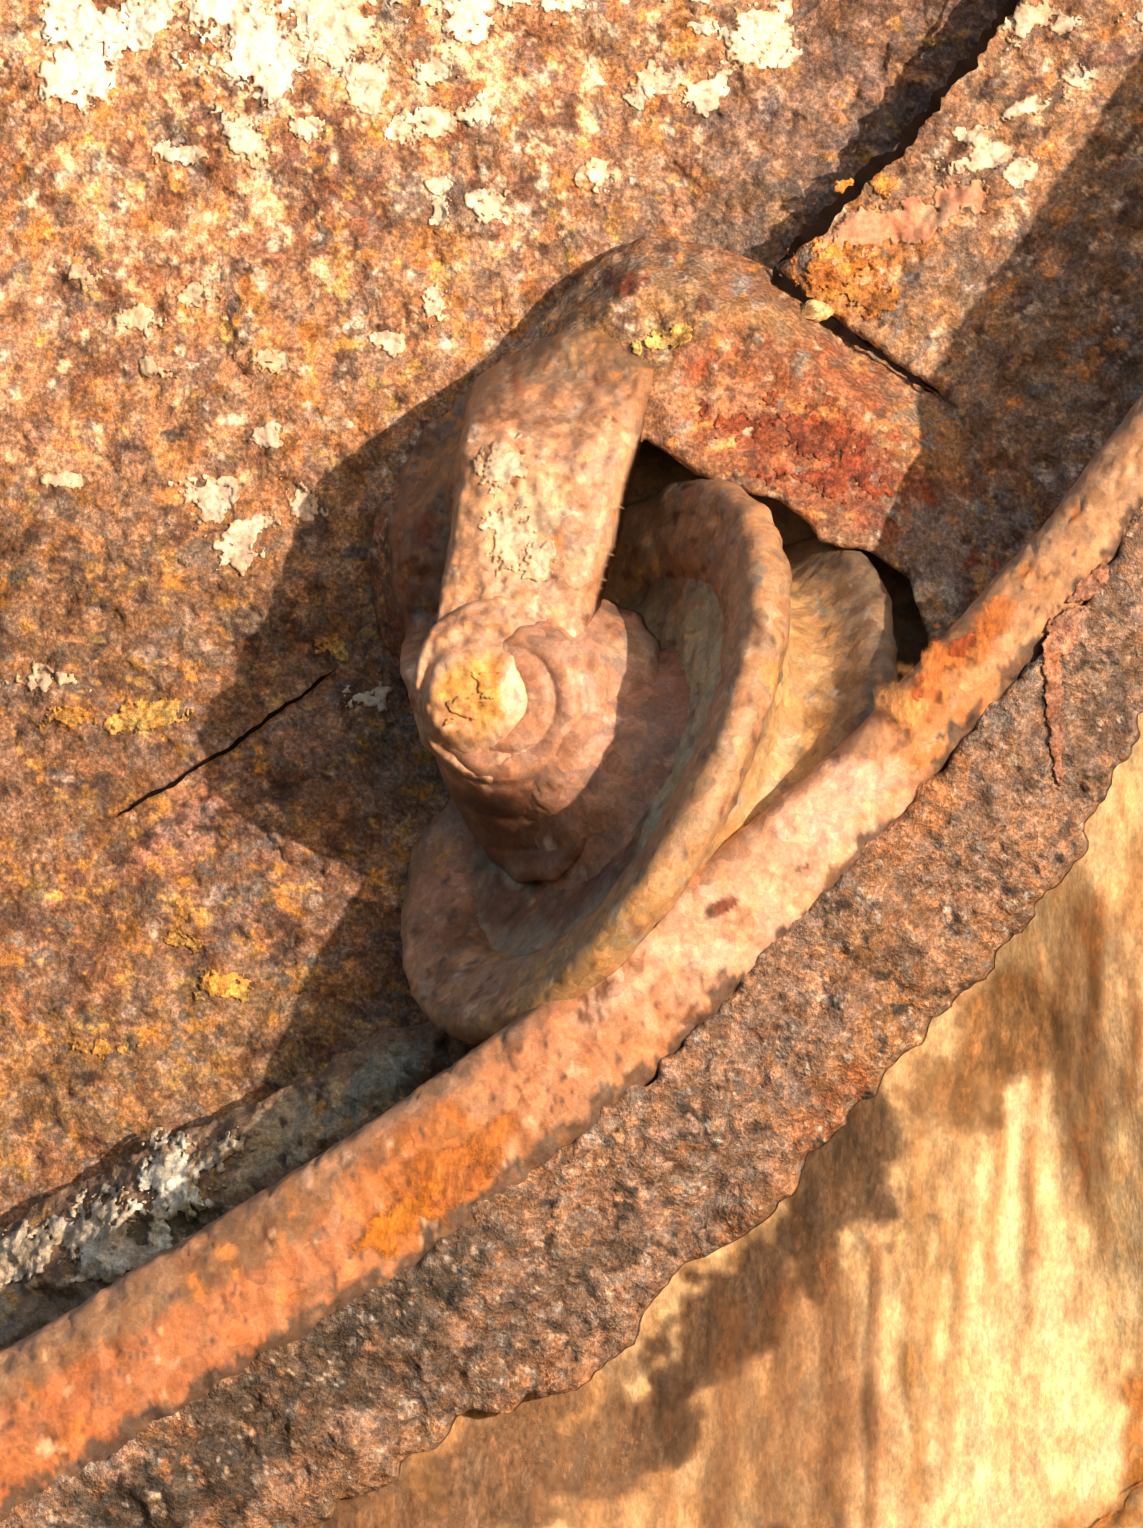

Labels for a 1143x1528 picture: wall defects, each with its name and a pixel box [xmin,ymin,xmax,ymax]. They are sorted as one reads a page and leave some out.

peeling [35,0,612,170]
peeling [424,176,516,228]
peeling [574,157,627,196]
corrosion [834,173,893,199]
crack [772,0,1019,400]
corrosion [787,238,902,321]
corrosion [39,697,195,735]
crack [116,668,337,817]
corrosion [875,596,1016,727]
efflorescence [0,1126,258,1289]
damp [328,965,1063,1528]
crack [1091,1481,1143,1528]